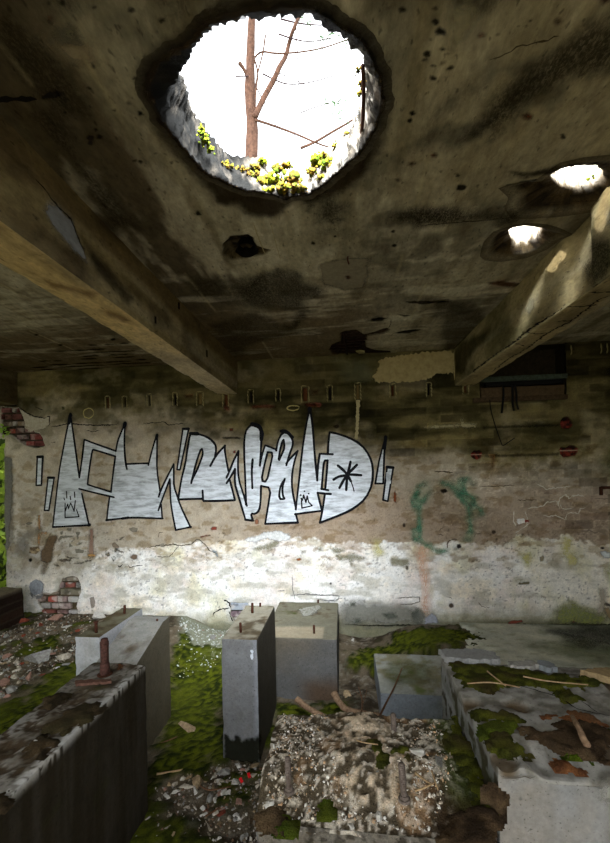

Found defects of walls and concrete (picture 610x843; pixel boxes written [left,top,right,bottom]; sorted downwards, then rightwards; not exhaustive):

crack [490,36,558,60]
spalling [133,0,395,204]
spalling [212,228,281,265]
spalling [480,155,610,262]
leakage [199,270,324,354]
flaking render [0,404,49,452]
flaking render [32,528,91,614]